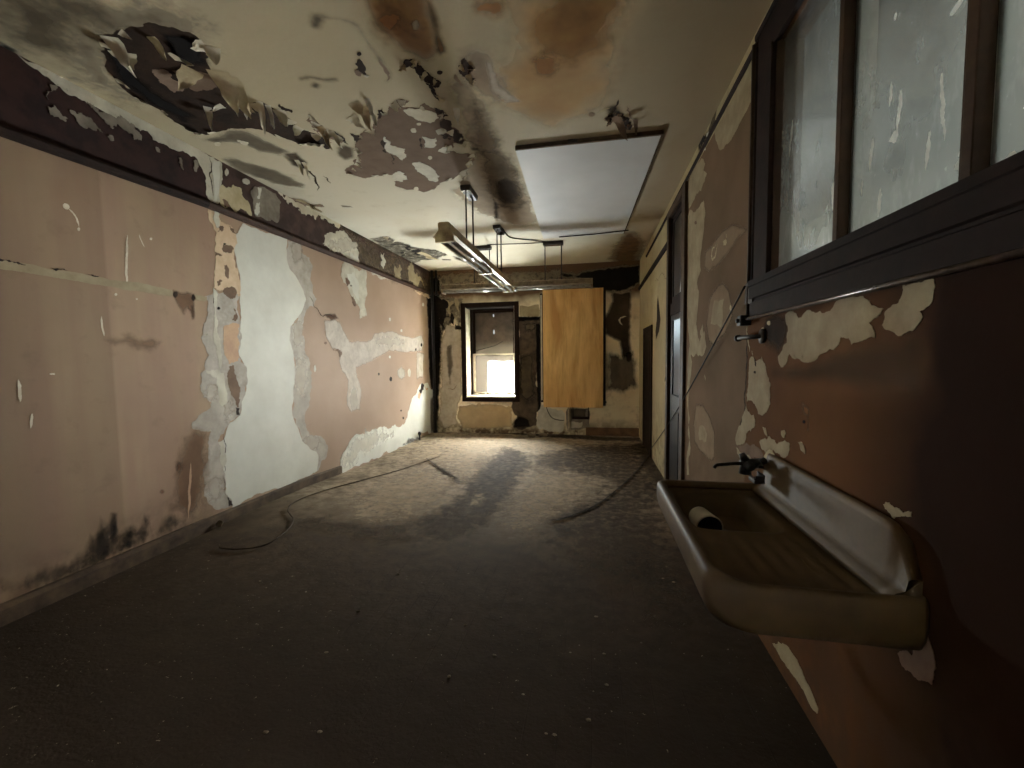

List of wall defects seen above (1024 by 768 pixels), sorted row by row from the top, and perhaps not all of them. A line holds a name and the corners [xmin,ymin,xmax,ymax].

damp [369,0,445,58]
damp [453,0,617,225]
flaking render [588,100,638,141]
flaking render [17,22,476,507]
damp [503,232,643,391]
peeling [686,159,732,475]
peeling [778,279,936,367]
peeling [735,356,806,459]
damp [25,431,207,587]
peeling [772,642,818,714]
peeling [897,635,936,685]